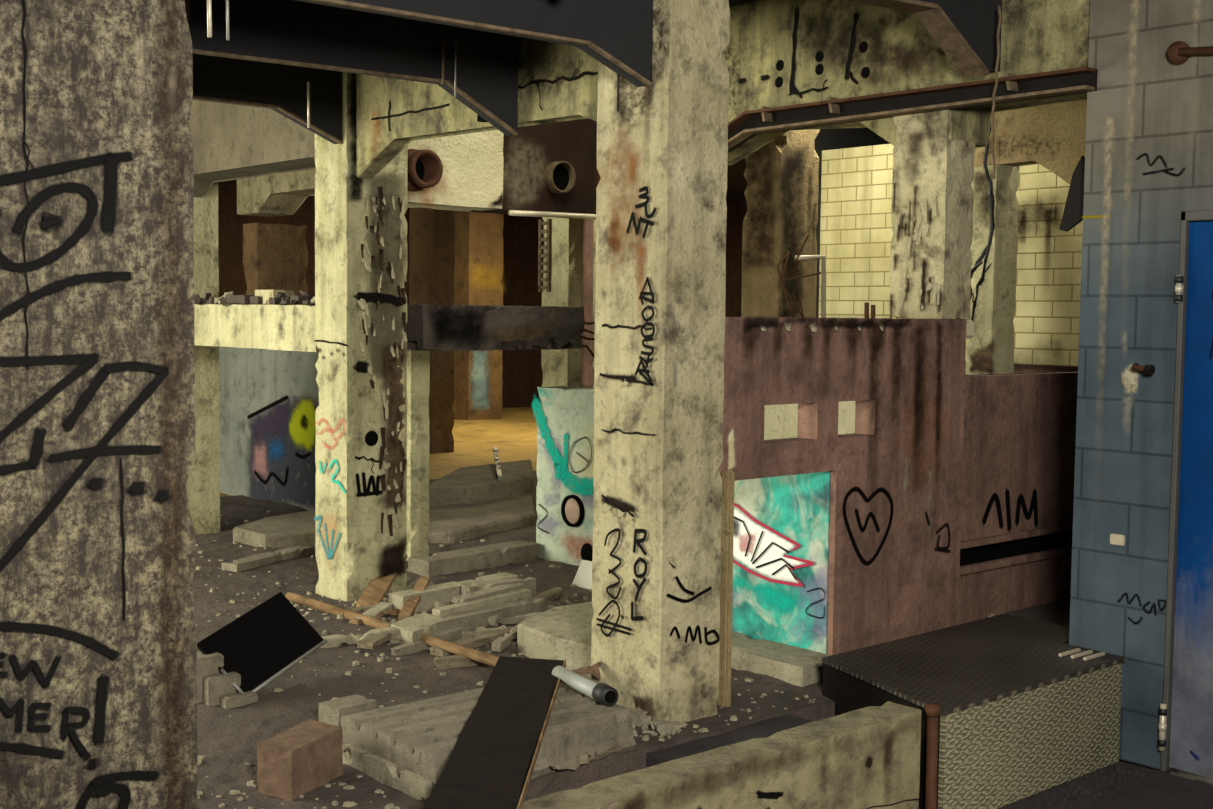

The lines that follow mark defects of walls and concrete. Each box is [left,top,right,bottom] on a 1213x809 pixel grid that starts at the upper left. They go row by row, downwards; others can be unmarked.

crack [518,61,598,110]
peeling [318,177,407,578]